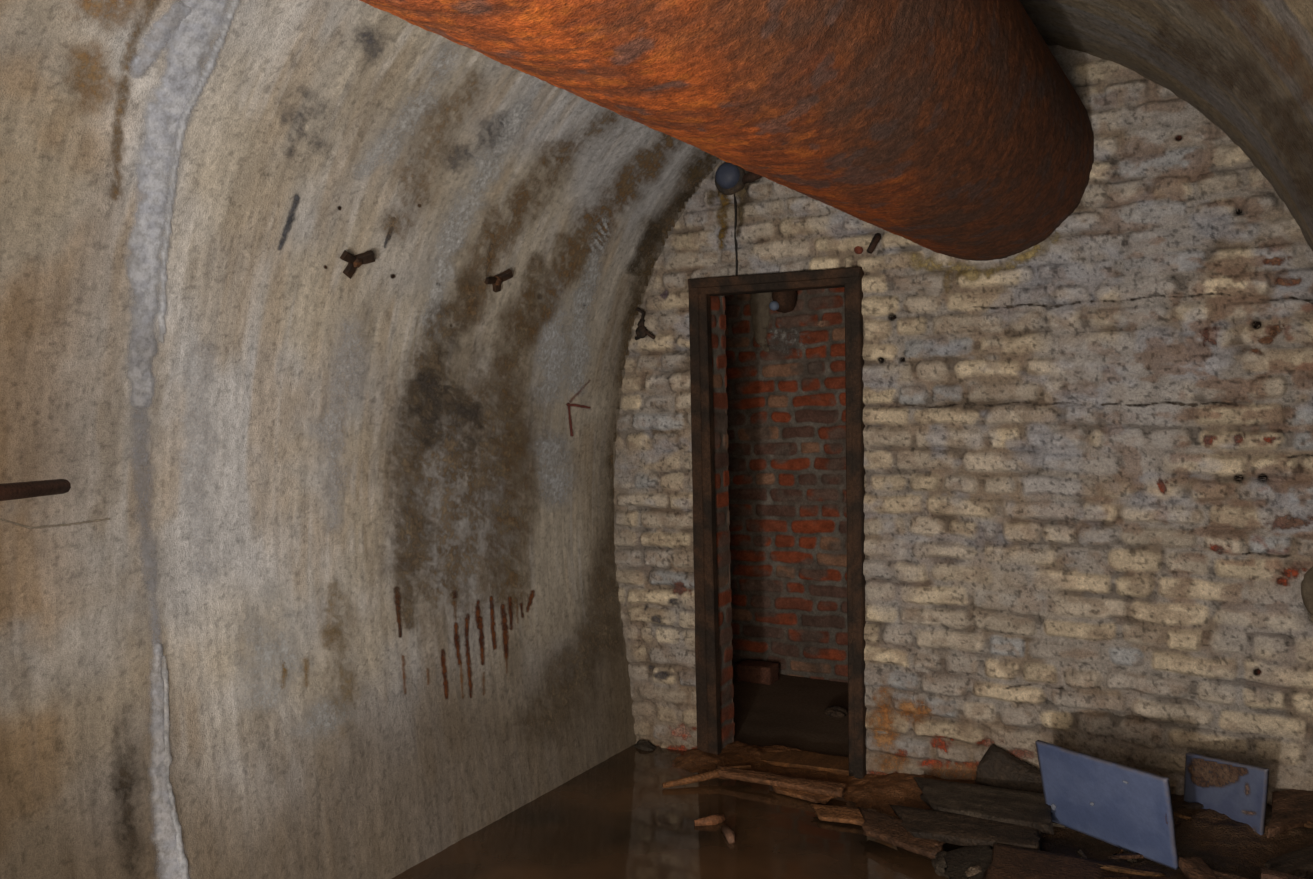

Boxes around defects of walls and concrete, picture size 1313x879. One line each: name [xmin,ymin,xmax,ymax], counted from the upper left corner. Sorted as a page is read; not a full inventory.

water stain [74,0,239,591]
water stain [361,51,675,629]
water stain [617,152,719,386]
rust [707,184,746,249]
water stain [114,763,137,859]
water stain [150,607,189,879]
rust [394,587,402,638]
rust [427,590,534,699]
water stain [525,425,620,736]